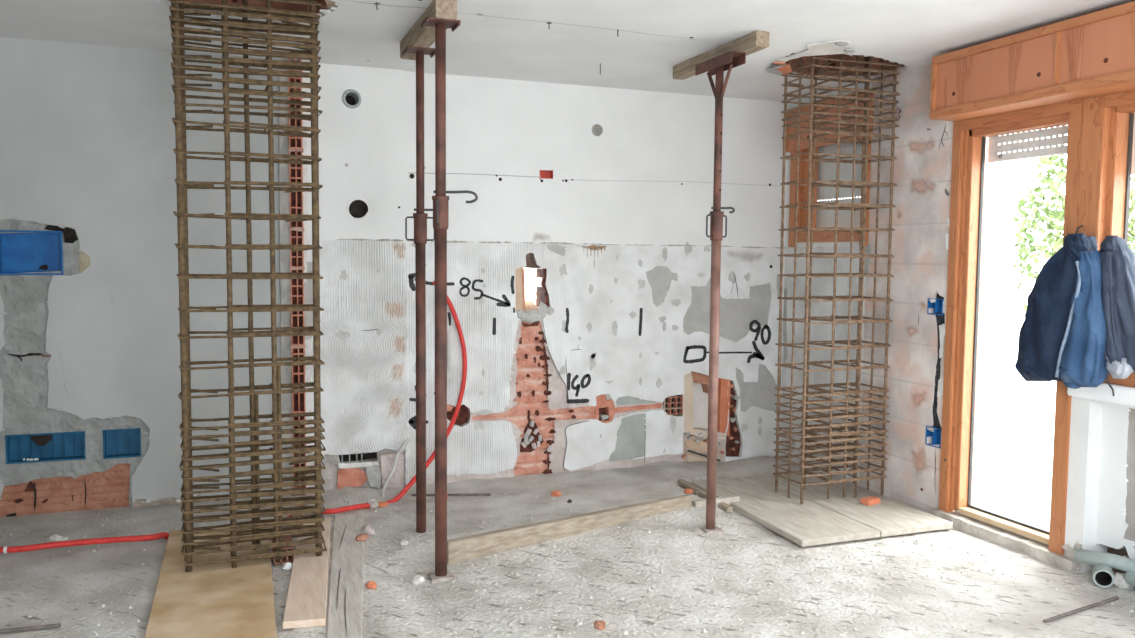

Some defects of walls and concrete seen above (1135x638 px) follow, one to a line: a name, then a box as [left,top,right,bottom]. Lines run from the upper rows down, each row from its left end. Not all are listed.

spalling [160,0,340,23]
flaking render [765,39,910,79]
flaking render [0,217,201,517]
flaking render [290,79,788,490]